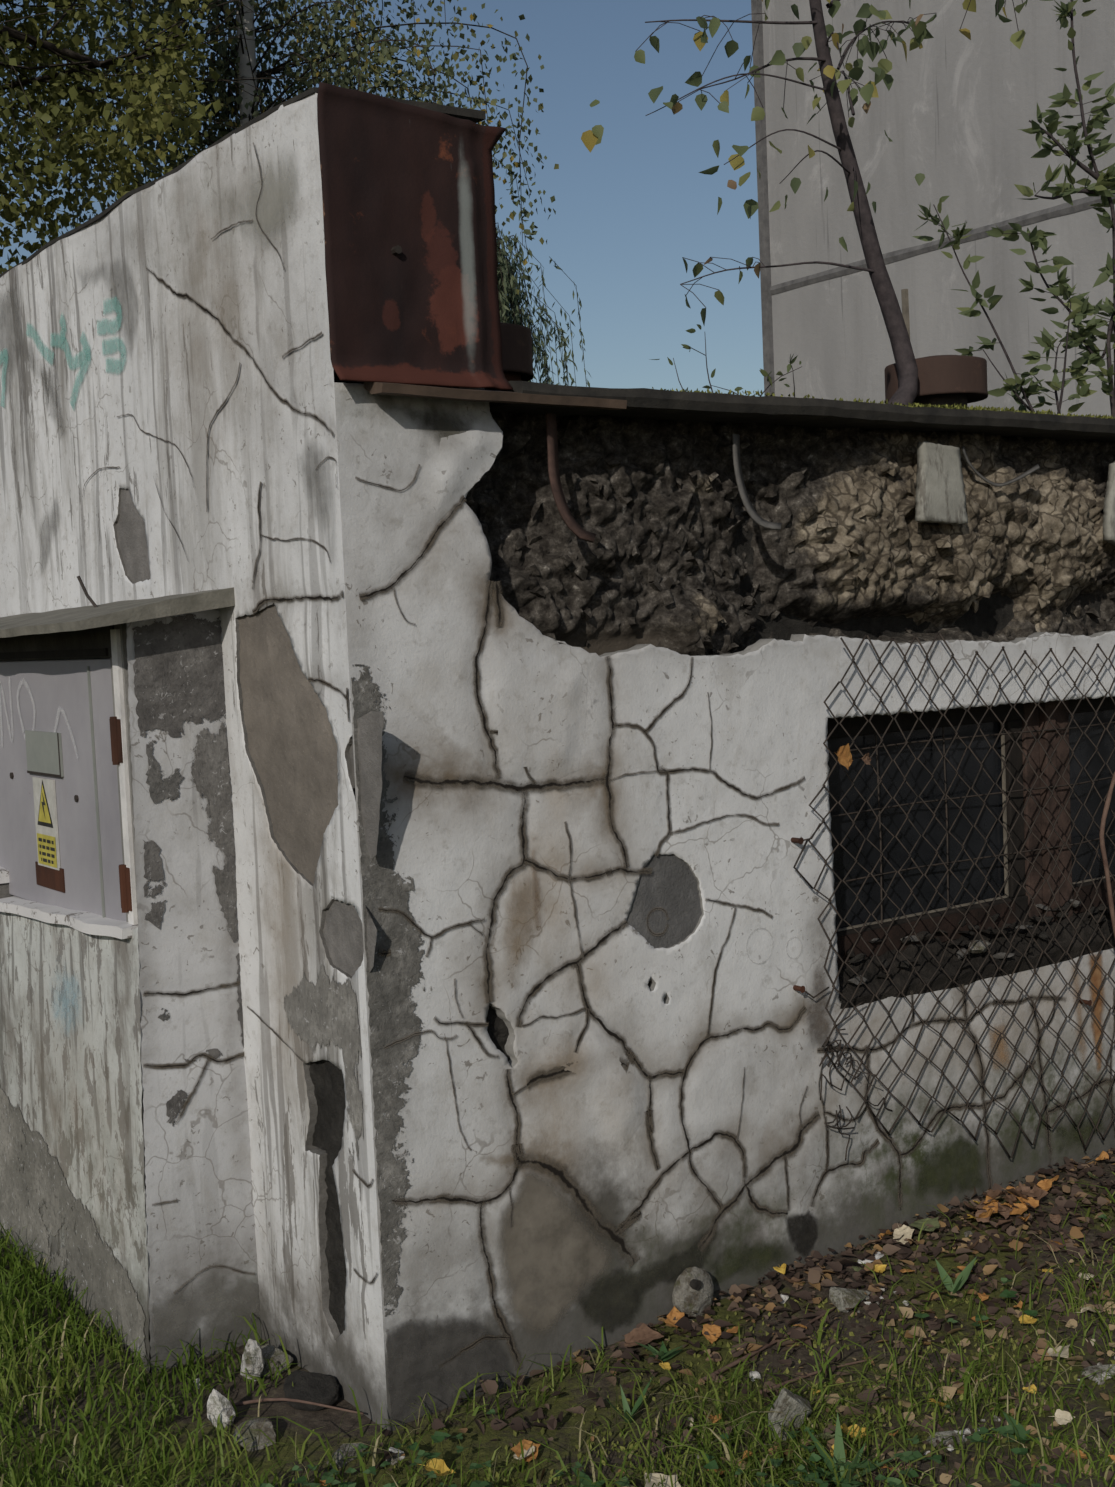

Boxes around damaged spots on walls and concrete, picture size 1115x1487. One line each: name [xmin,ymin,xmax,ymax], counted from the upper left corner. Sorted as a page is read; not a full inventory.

crack [82,268,420,549]
peeling [116,488,150,583]
crack [252,481,466,625]
spalling [465,412,1115,656]
crack [143,981,304,1122]
peeling [132,605,426,1335]
spalling [627,854,702,948]
crack [352,580,1115,1370]
corrosion [1074,955,1103,1069]
damp [580,1232,716,1332]
damp [787,1212,817,1256]
damp [386,1320,510,1432]